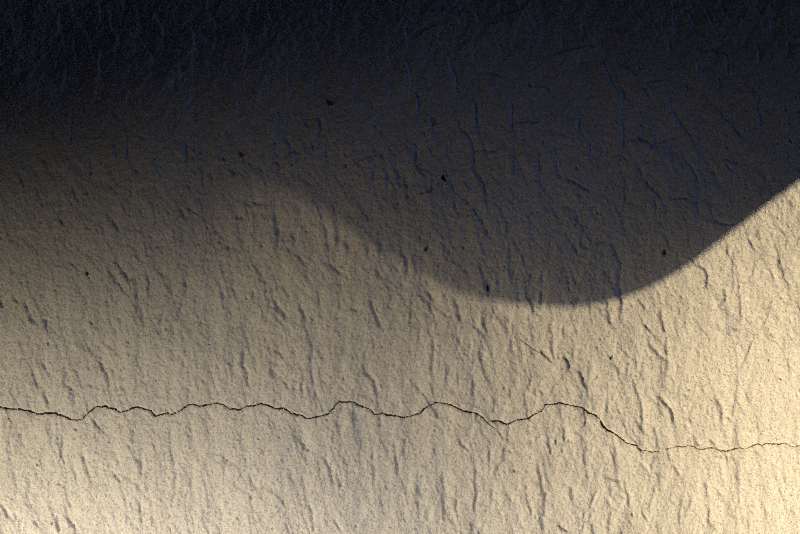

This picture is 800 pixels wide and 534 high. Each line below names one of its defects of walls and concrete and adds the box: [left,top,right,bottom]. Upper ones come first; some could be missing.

crack [0,401,797,453]